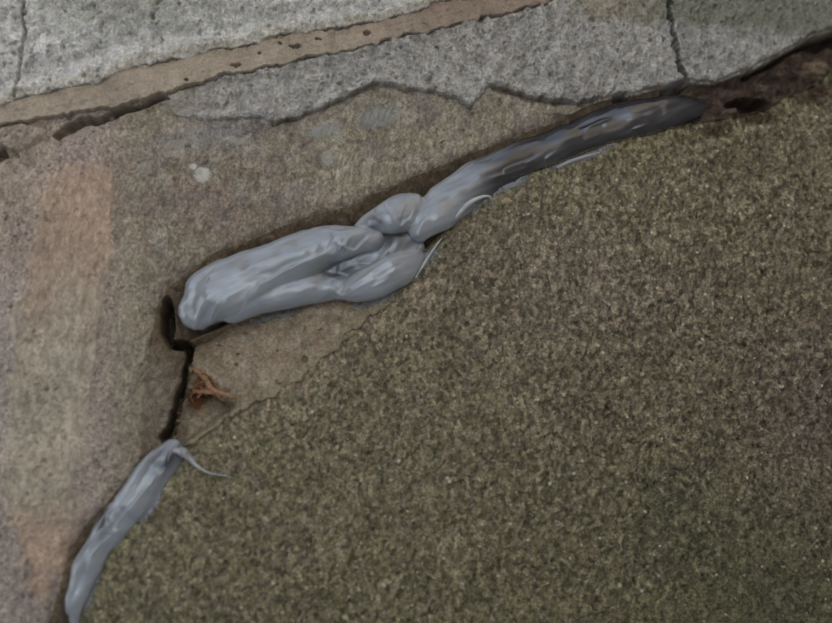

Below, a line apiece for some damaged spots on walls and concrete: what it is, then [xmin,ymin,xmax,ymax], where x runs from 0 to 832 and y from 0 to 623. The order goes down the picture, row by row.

crack [13,2,28,98]
spalling [0,124,47,163]
spalling [56,102,155,141]
crack [49,0,699,623]
spalling [175,274,421,447]